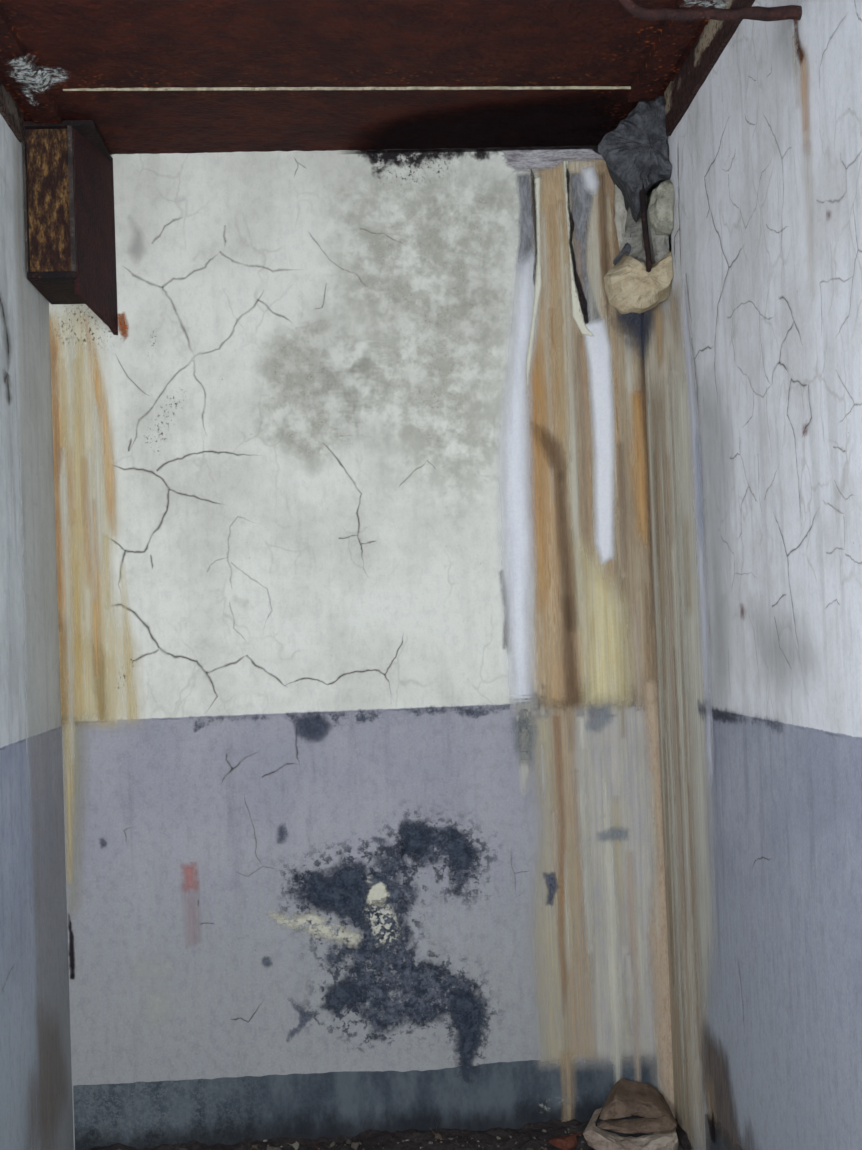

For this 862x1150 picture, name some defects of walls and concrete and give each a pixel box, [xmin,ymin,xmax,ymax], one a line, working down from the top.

rust [794,18,807,144]
crack [118,237,287,418]
spalling [566,96,674,324]
crack [678,117,812,459]
rust [52,313,130,722]
crack [107,432,244,577]
crack [118,604,403,698]
crack [332,453,374,549]
rust [528,158,709,1146]
crack [732,453,861,662]
leakage [270,821,493,1080]
leakage [704,1030,741,1150]